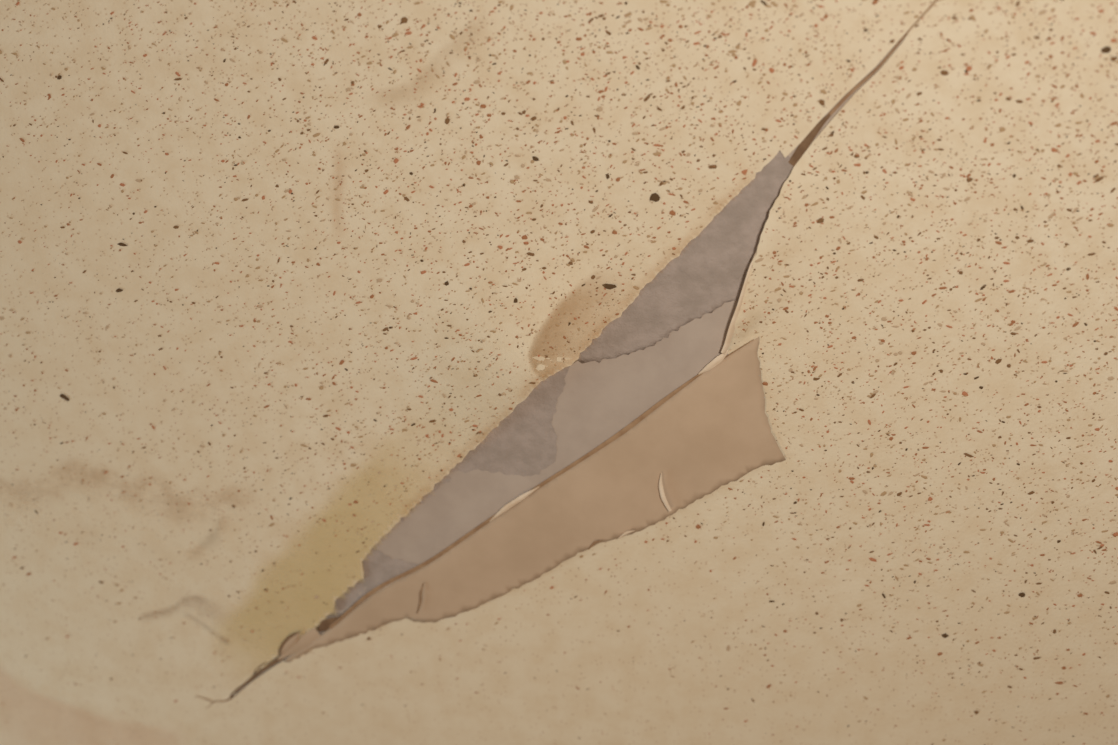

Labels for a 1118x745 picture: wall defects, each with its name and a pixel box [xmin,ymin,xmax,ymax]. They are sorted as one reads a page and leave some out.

crack [788,0,940,166]
peeling [231,34,907,699]
crack [196,658,283,706]